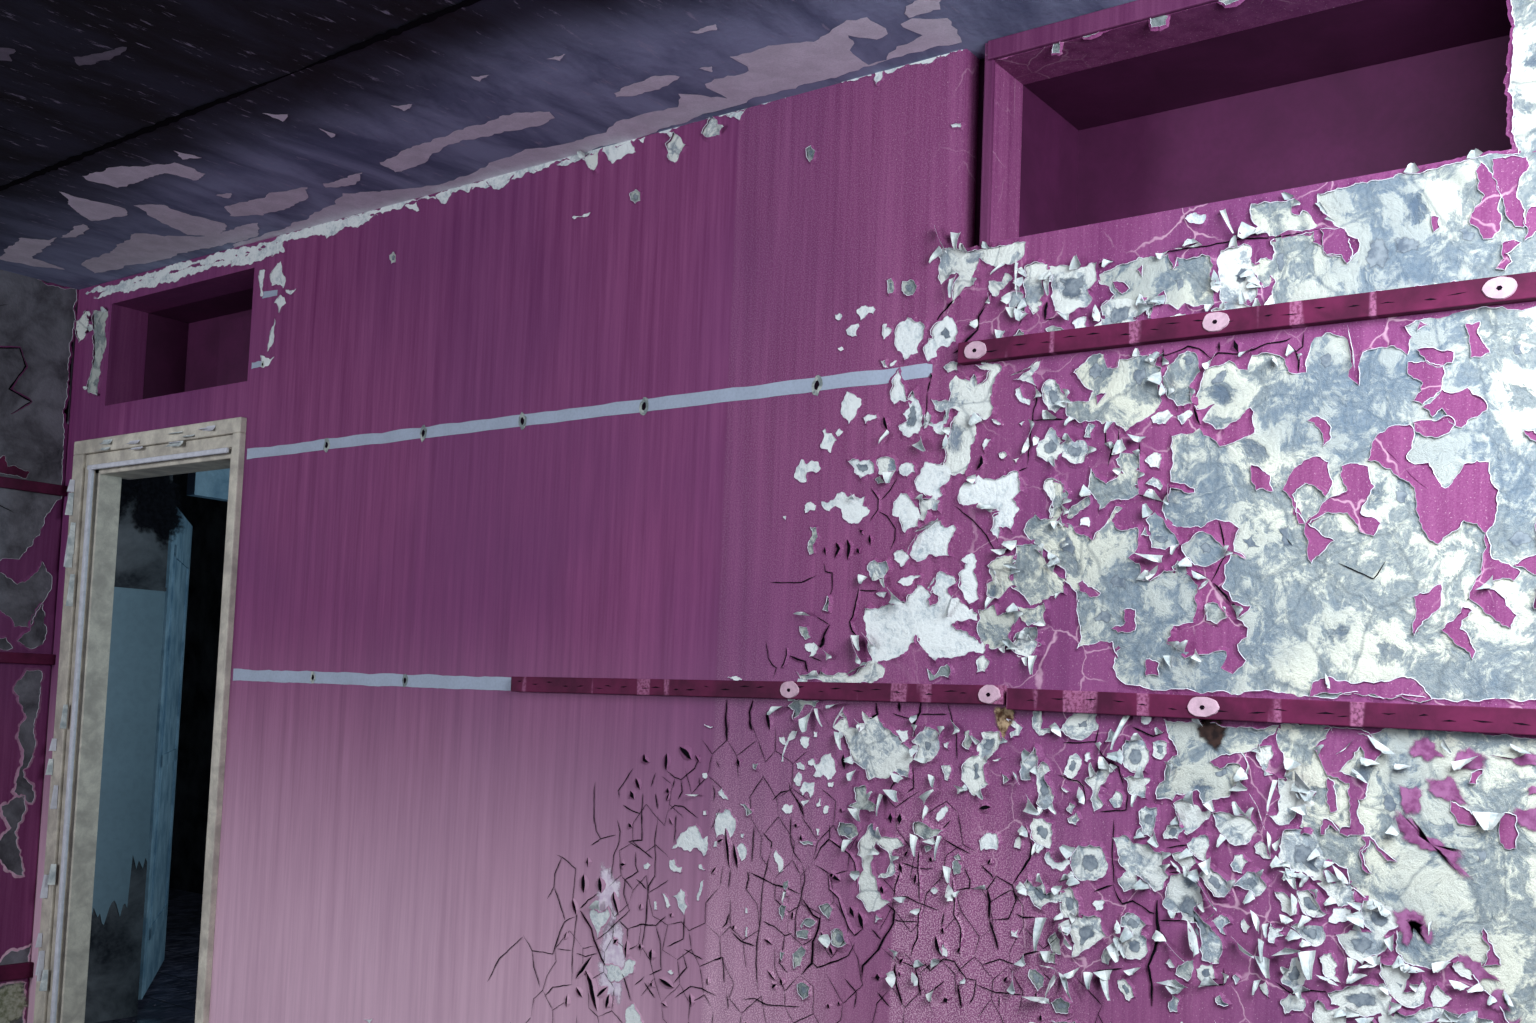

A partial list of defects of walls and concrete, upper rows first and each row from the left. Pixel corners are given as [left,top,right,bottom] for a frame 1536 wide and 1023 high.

spalling [0,97,788,917]
peeling [767,0,1536,1023]
crack [1191,522,1243,619]
crack [488,479,1185,1023]
peeling [589,900,612,939]
spalling [0,933,48,1023]
peeling [605,956,637,983]
peeling [625,1003,644,1023]
crack [1199,968,1229,987]
crack [1276,982,1326,995]